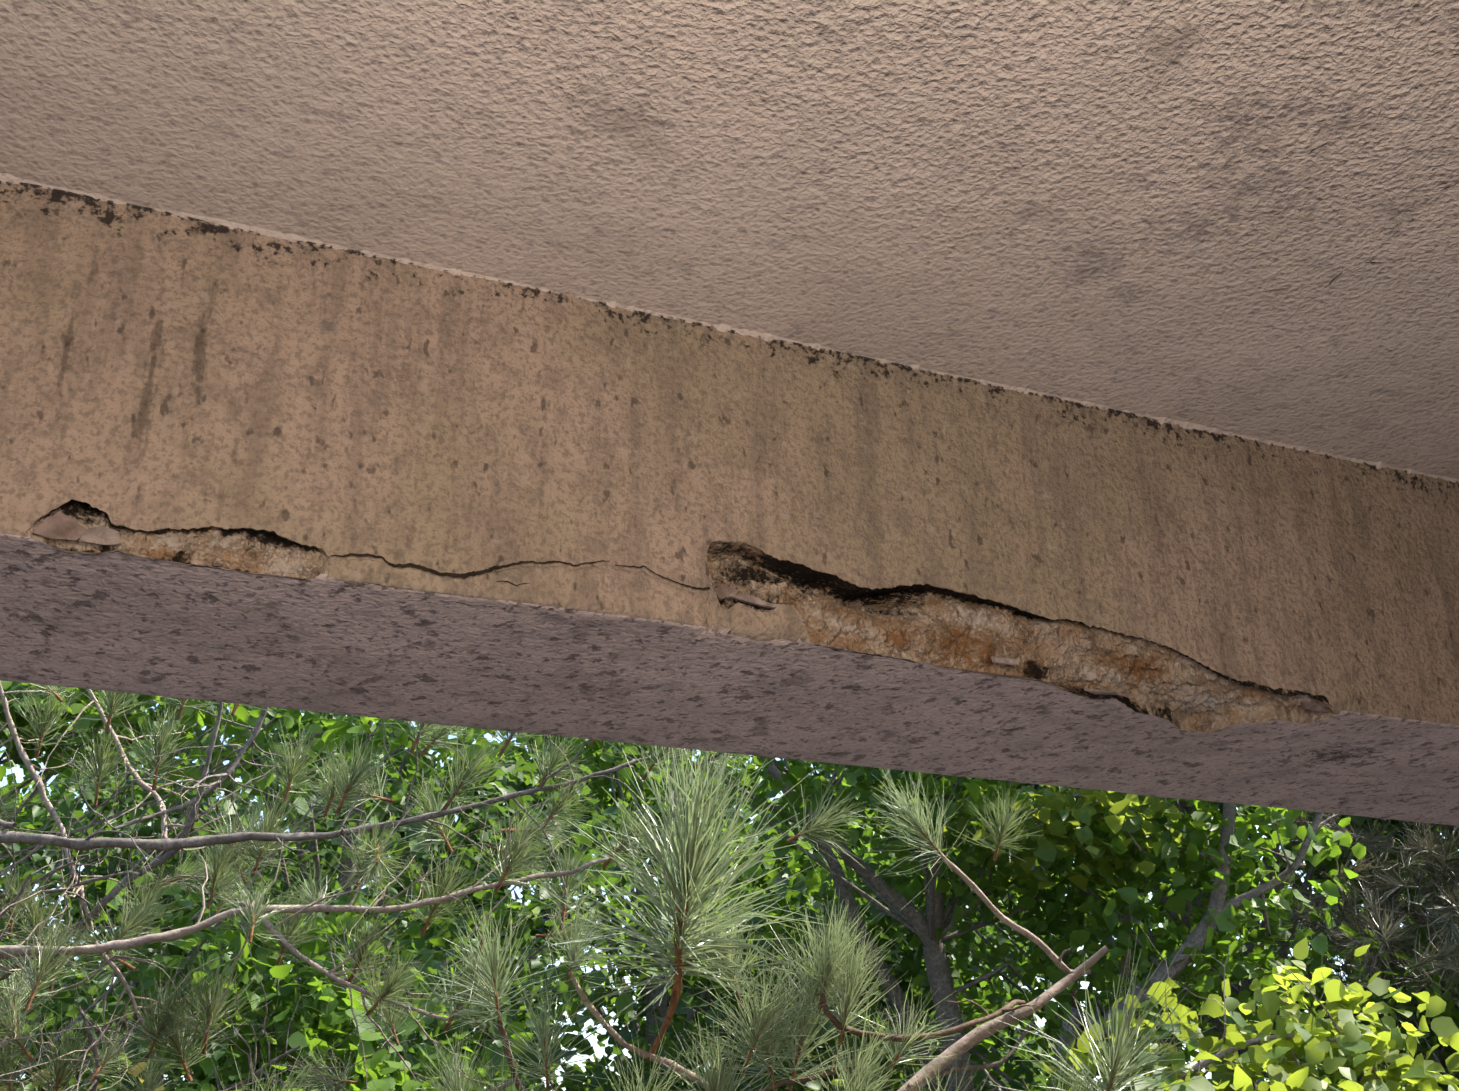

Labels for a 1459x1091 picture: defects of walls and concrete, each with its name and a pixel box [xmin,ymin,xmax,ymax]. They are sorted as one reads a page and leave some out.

spalling [25,499,330,580]
crack [331,553,710,606]
spalling [706,540,1335,733]